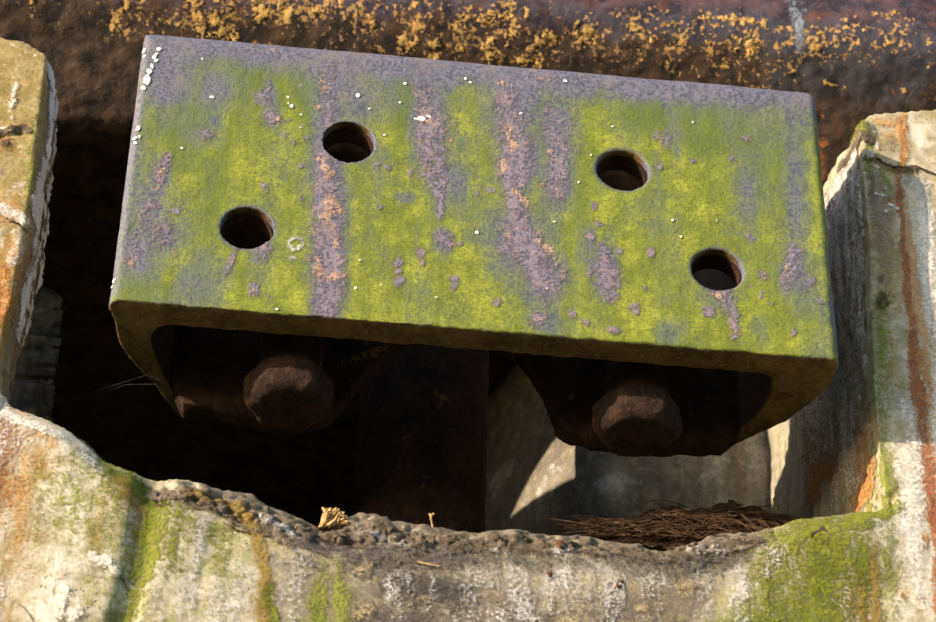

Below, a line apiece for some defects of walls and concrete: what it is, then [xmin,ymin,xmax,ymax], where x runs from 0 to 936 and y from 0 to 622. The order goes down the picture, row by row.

crack [874,155,936,180]
corrosion [0,264,58,599]
damp [281,545,627,622]
damp [684,121,936,622]
corrosion [874,113,936,613]